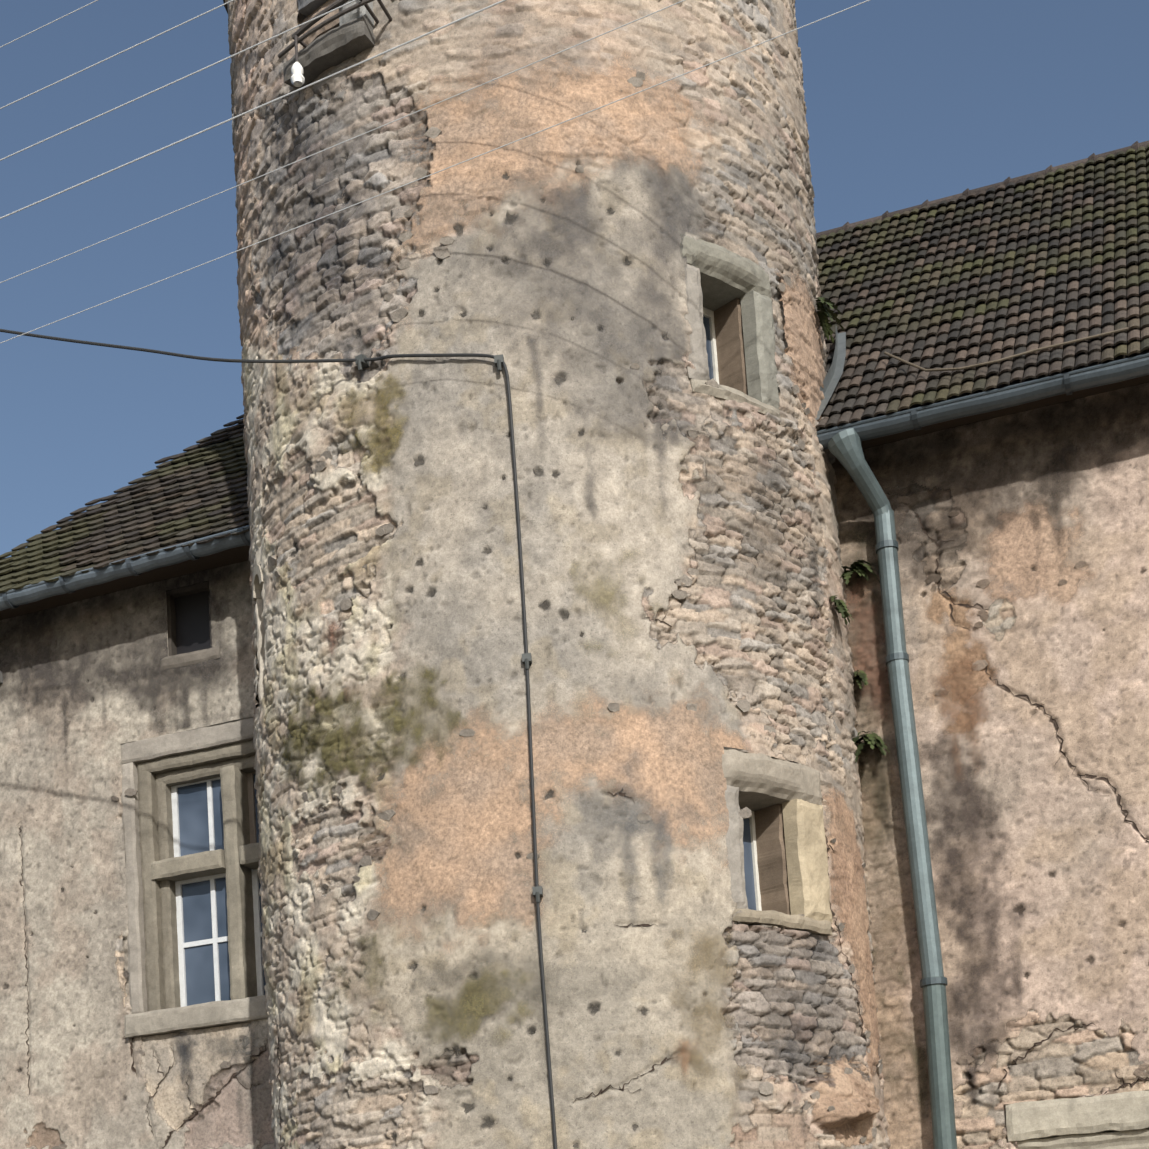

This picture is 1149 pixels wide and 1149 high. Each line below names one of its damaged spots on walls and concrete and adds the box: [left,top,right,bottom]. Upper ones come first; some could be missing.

spalling [249,60,701,391]
water stain [512,185,592,269]
flaking render [282,273,837,927]
crack [914,512,990,629]
crack [985,667,1149,843]
water stain [926,739,1019,1053]
spalling [714,789,883,1149]
crack [124,1036,284,1149]
flaking render [136,1022,274,1149]
crack [573,1053,680,1103]
water stain [967,1064,977,1097]
spalling [953,1009,1149,1149]